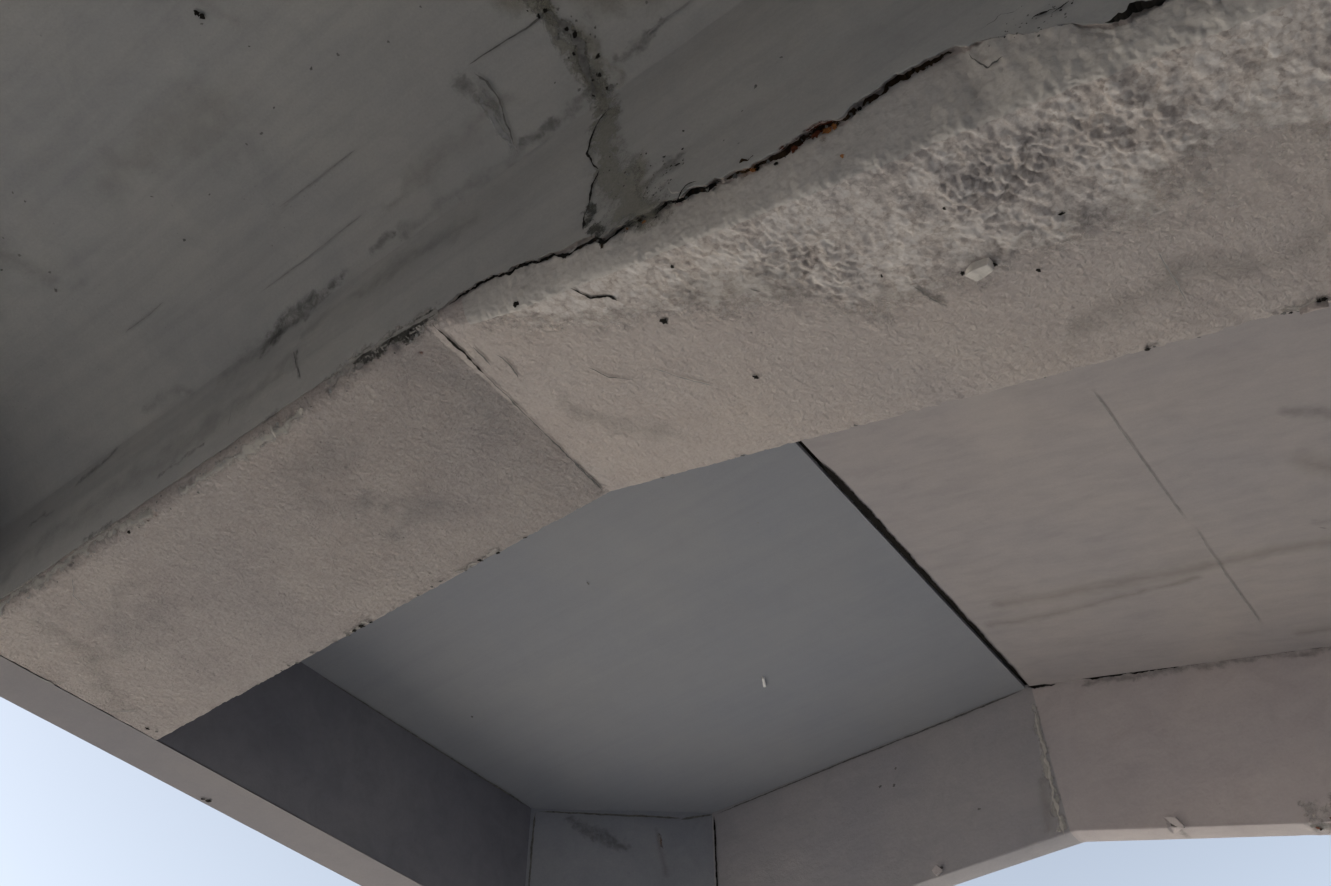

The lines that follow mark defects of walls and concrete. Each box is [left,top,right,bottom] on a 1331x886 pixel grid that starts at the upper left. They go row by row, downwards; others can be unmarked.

crack [433,8,952,490]
spalling [462,0,1331,330]
crack [1105,0,1166,23]